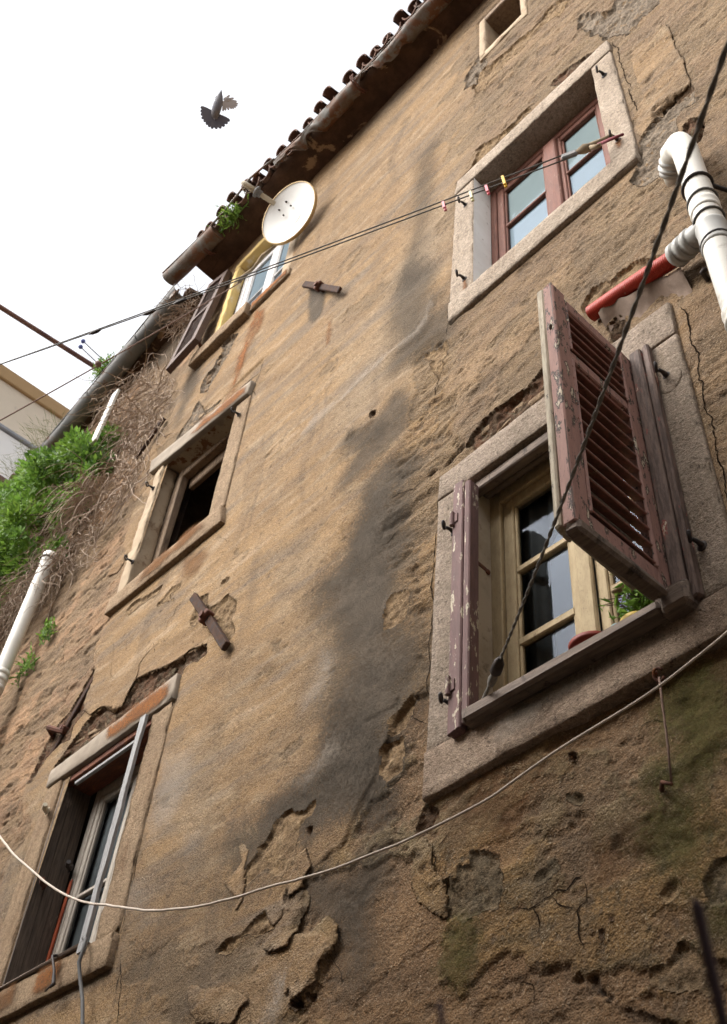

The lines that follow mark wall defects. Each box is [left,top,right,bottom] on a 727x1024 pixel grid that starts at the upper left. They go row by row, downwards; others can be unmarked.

peeling [577,0,705,187]
spalling [607,315,627,343]
spalling [465,368,545,450]
crack [681,308,727,498]
spalling [189,576,237,640]
peeling [26,639,207,784]
spalling [379,693,416,783]
spalling [215,799,338,1011]
crack [511,874,587,947]